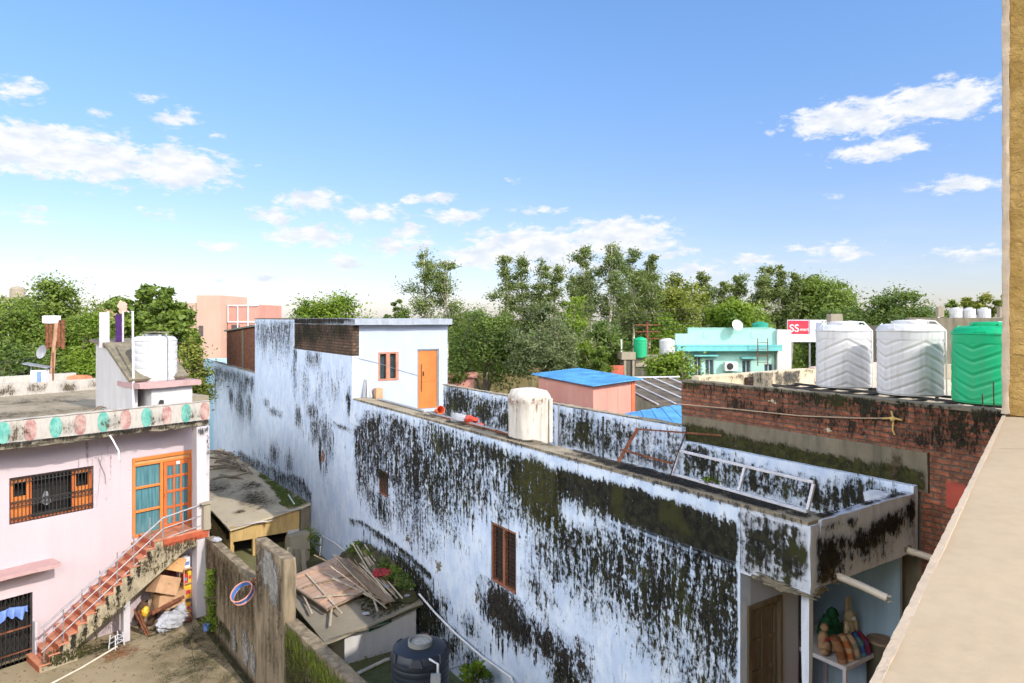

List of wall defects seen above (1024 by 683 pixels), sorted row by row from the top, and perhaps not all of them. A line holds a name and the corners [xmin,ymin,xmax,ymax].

water stain [209,440,312,513]
water stain [254,318,925,683]
water stain [50,538,329,683]